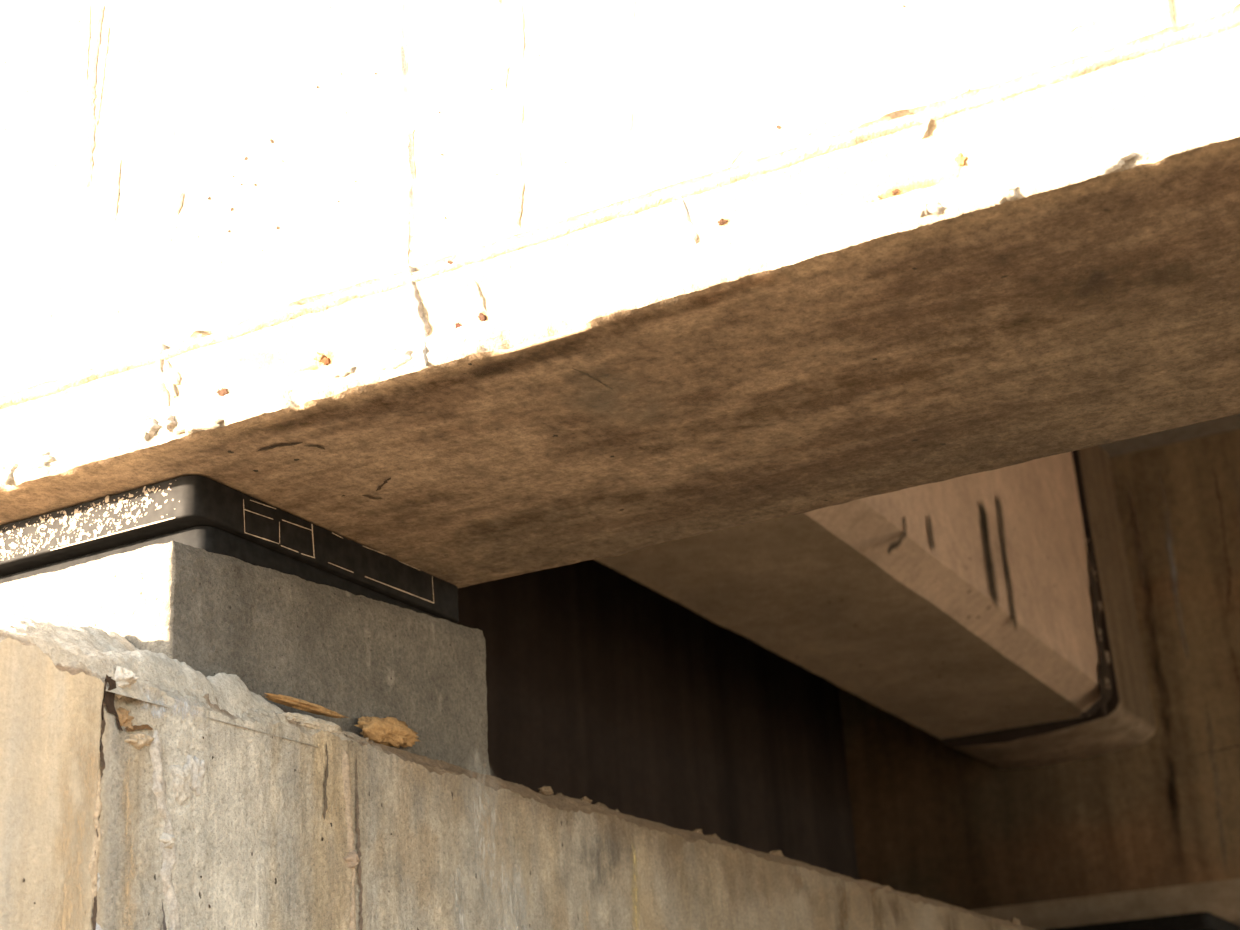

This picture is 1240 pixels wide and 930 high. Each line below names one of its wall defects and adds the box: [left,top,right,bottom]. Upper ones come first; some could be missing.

crack [89,678,107,930]
spalling [0,633,1039,930]